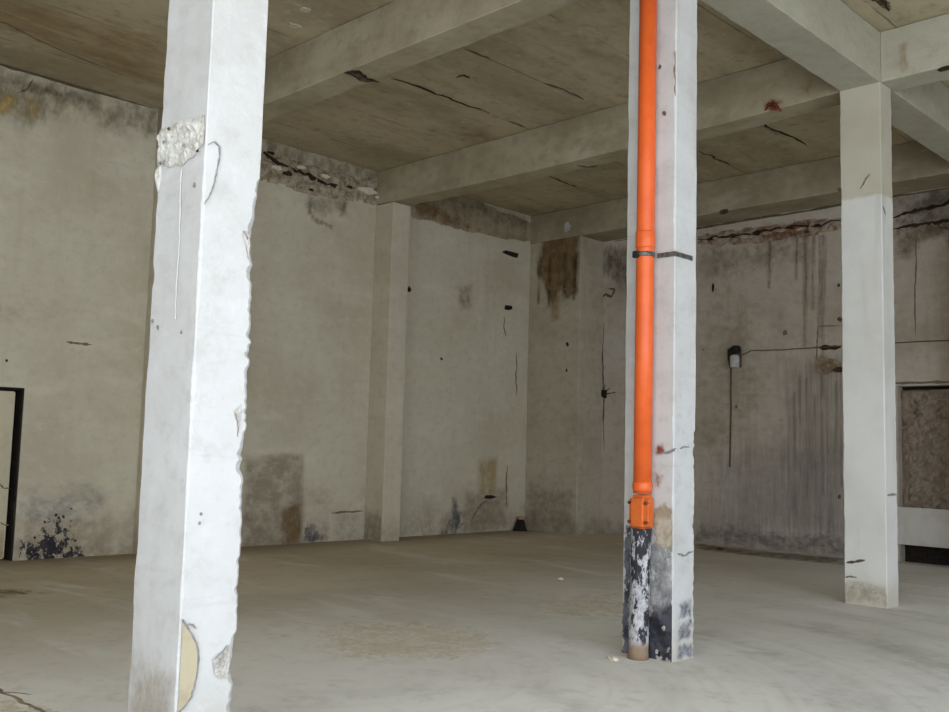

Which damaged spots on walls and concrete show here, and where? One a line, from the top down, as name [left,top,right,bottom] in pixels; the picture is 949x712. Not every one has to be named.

spalling [871,0,891,12]
crack [391,49,524,127]
spalling [157,115,205,168]
spalling [259,151,379,206]
peeling [411,196,531,258]
crack [696,204,841,230]
crack [883,188,949,335]
damp [19,508,84,560]
crack [0,688,46,712]